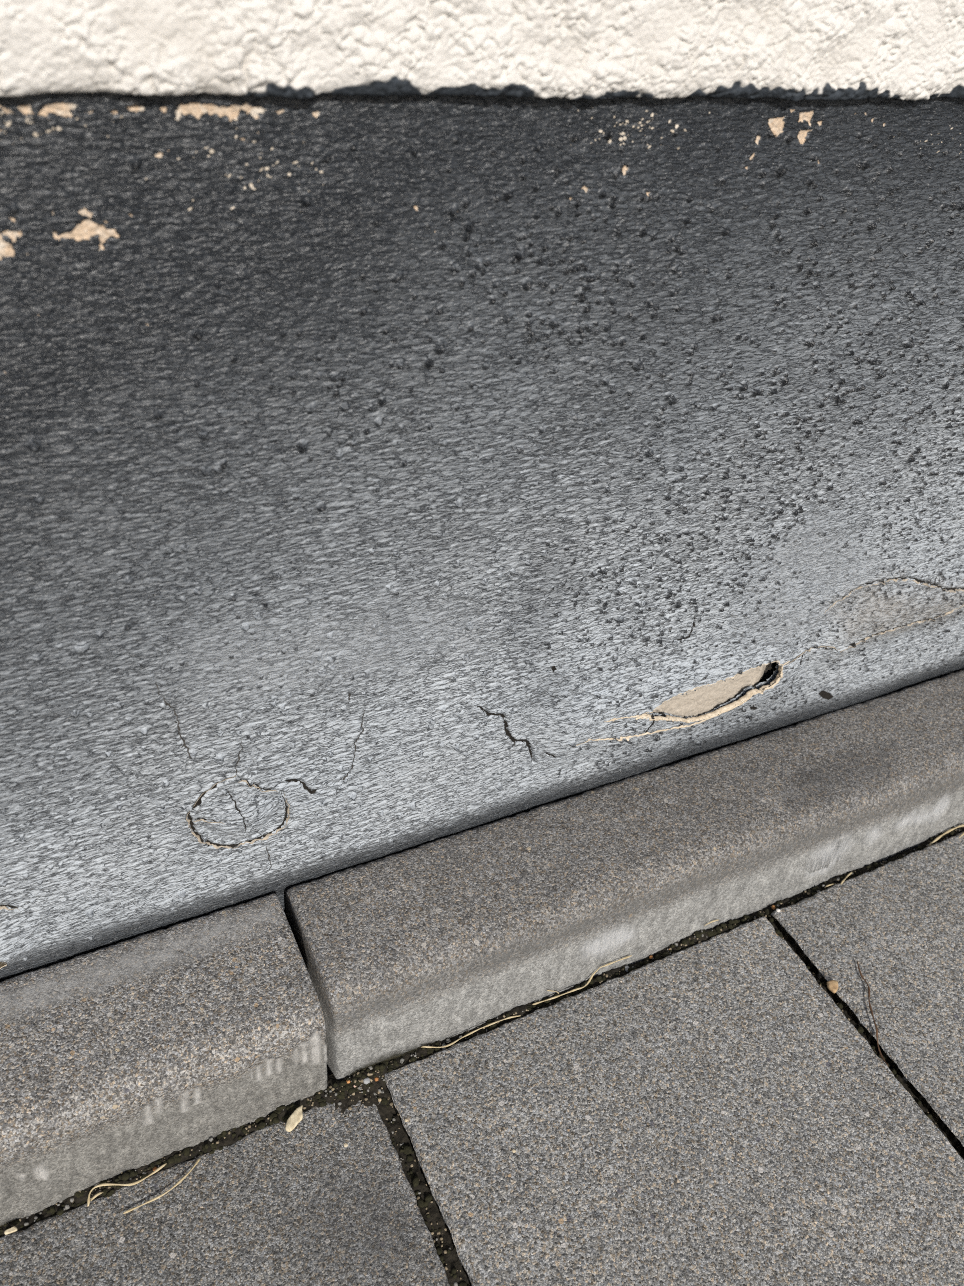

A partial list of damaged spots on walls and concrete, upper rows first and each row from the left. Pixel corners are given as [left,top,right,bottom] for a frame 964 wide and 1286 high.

peeling [0,102,92,144]
peeling [160,103,324,192]
peeling [745,110,822,169]
peeling [0,218,28,260]
peeling [53,208,120,251]
crack [155,683,192,763]
crack [477,706,557,758]
spalling [569,661,790,748]
crack [186,693,365,868]